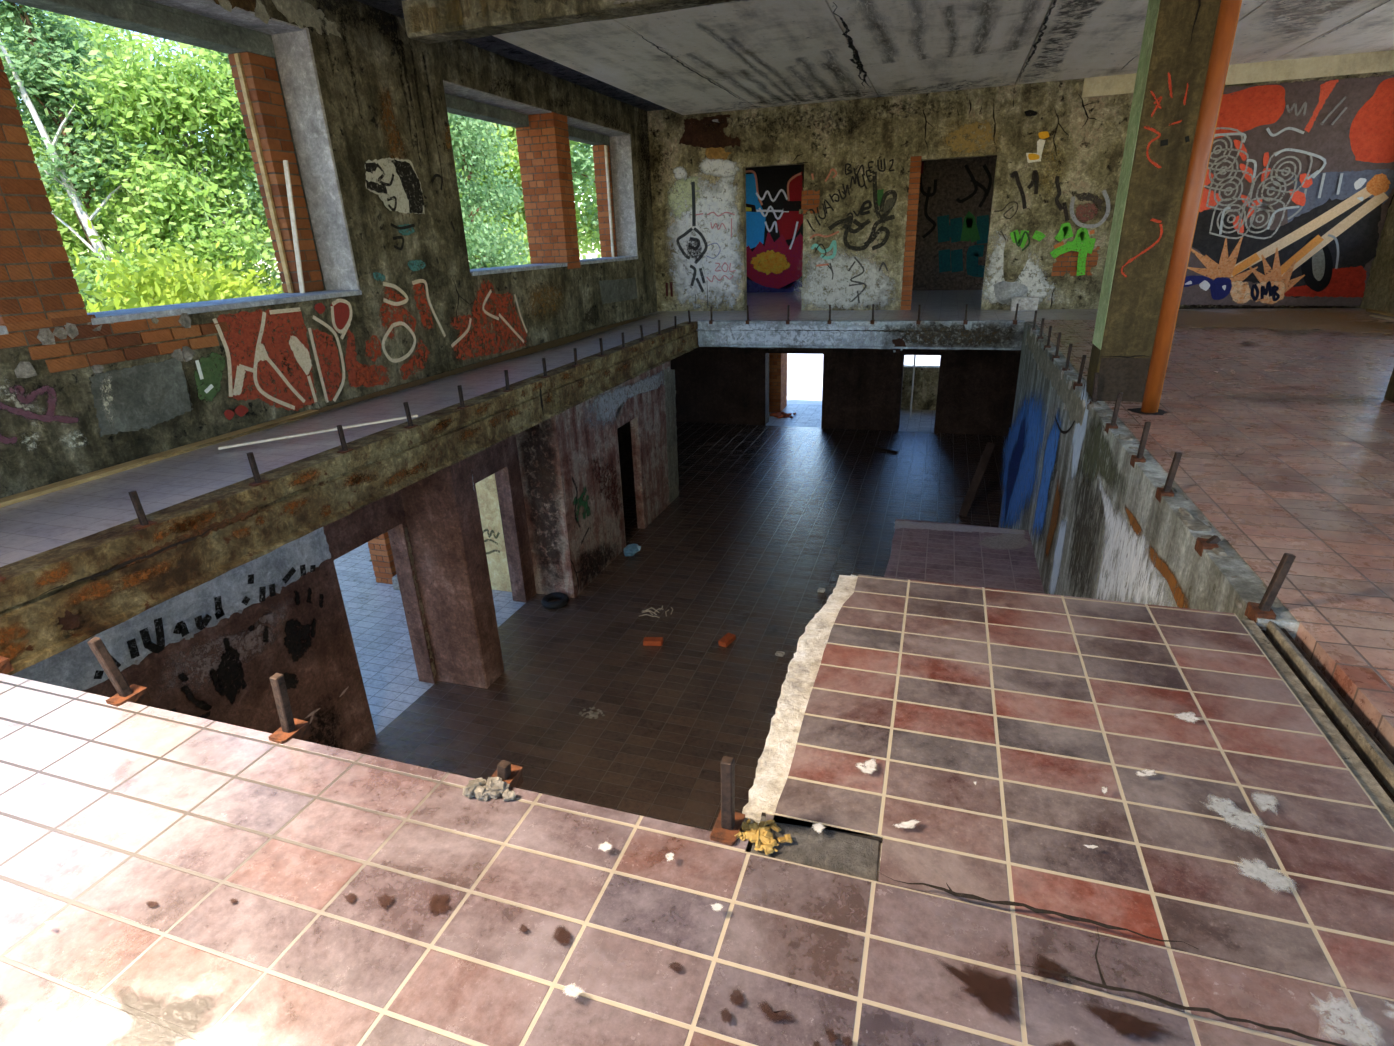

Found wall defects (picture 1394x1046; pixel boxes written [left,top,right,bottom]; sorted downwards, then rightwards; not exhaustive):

peeling [214,0,342,39]
crack [833,2,869,86]
rust [343,462,428,488]
rust [36,561,171,604]
crack [878,872,1347,1046]
damp [108,987,215,1046]